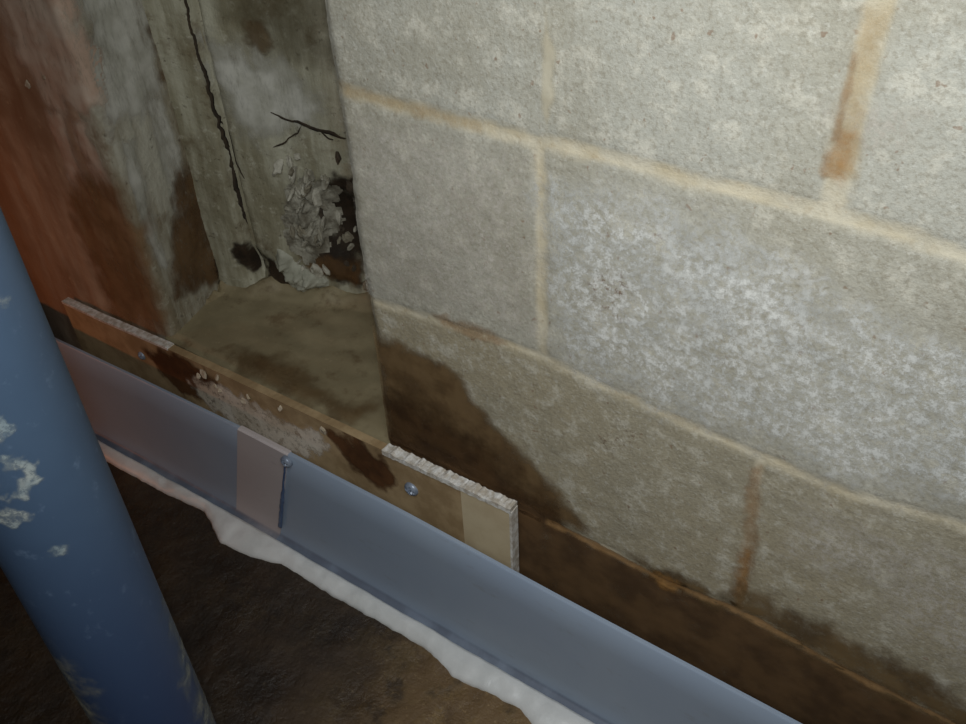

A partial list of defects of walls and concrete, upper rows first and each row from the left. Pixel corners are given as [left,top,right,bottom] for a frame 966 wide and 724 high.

damp [83,0,219,299]
crack [184,0,251,235]
crack [270,112,346,147]
damp [307,256,360,284]
damp [549,182,966,501]
damp [326,429,395,490]
damp [373,332,966,724]